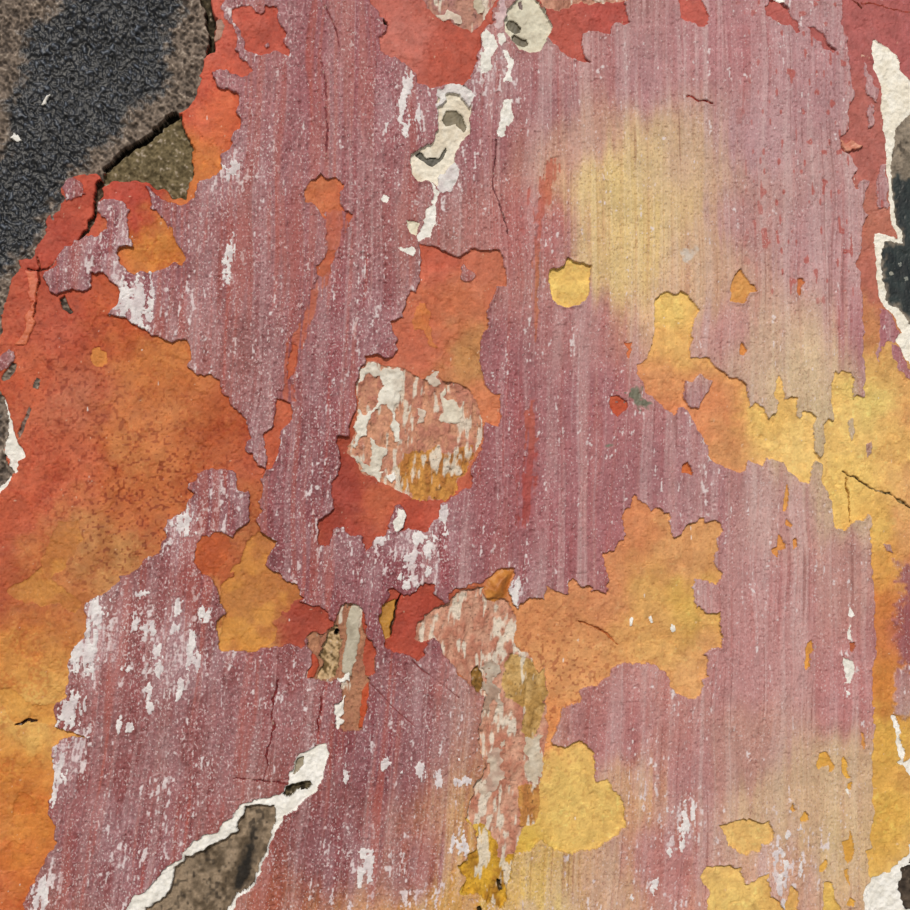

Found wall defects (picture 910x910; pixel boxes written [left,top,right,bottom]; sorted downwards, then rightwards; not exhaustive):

crack [80,112,180,239]
peeling [0,0,724,910]
peeling [624,0,910,910]
crack [842,471,910,523]